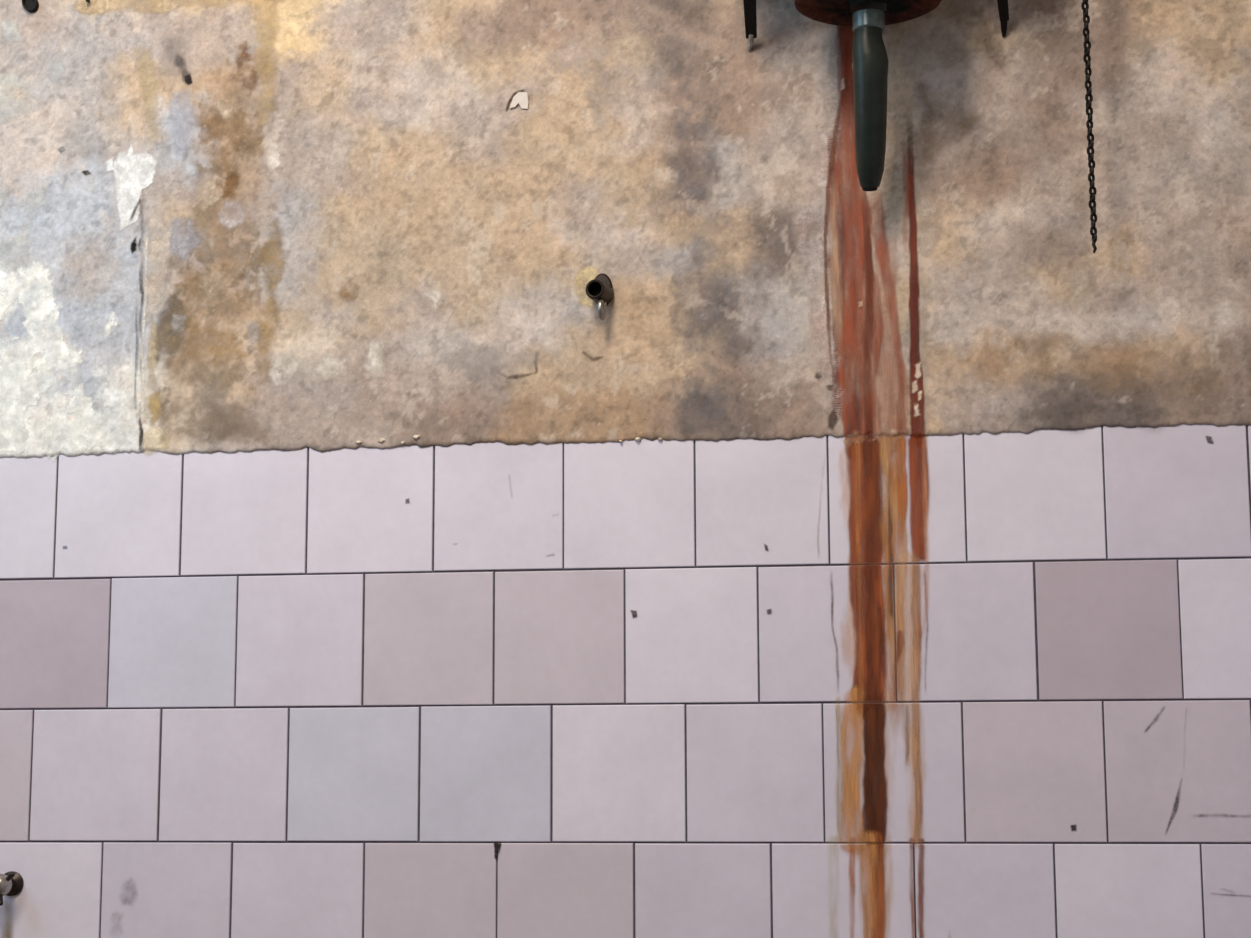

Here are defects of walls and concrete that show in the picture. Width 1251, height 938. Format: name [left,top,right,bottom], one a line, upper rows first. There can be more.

water stain [237,44,256,89]
peeling [0,262,124,461]
peeling [106,147,171,368]
peeling [143,397,169,453]
water stain [157,101,280,361]
rust [824,26,928,938]